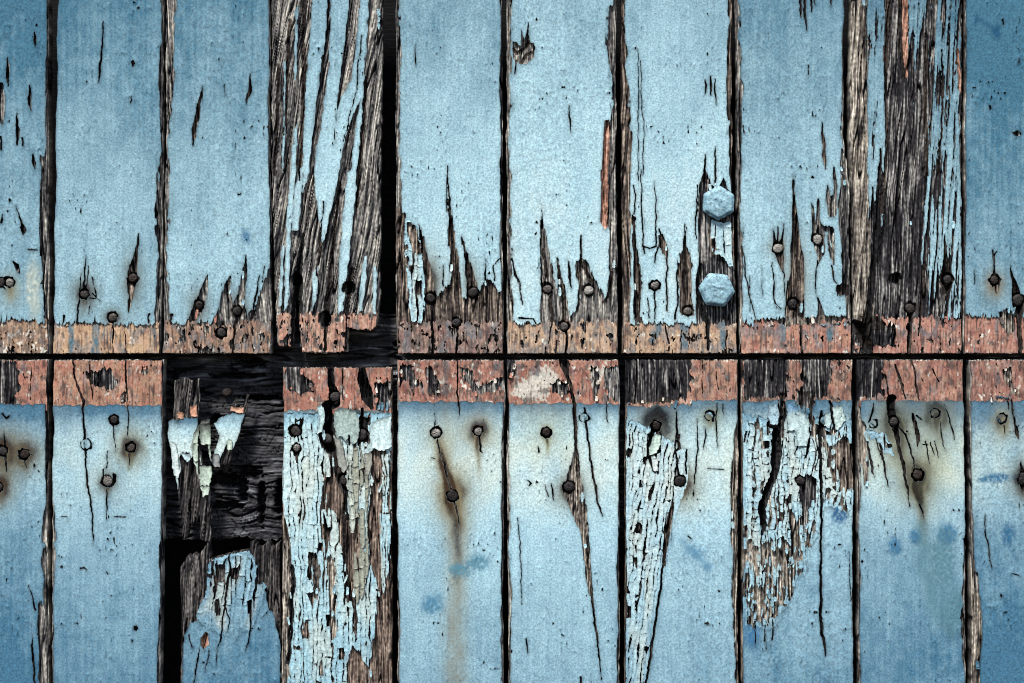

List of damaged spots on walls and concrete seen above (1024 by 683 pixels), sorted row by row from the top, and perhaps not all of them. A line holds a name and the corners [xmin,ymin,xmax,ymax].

peeling [179,0,383,354]
peeling [754,0,963,330]
peeling [169,419,232,497]
peeling [180,543,221,683]
peeling [247,540,292,683]
peeling [311,442,393,683]
peeling [372,165,516,412]
corrosion [437,440,468,585]
corrosion [467,419,489,456]
crack [403,54,1024,683]
peeling [730,443,818,623]
corrosion [881,406,933,520]